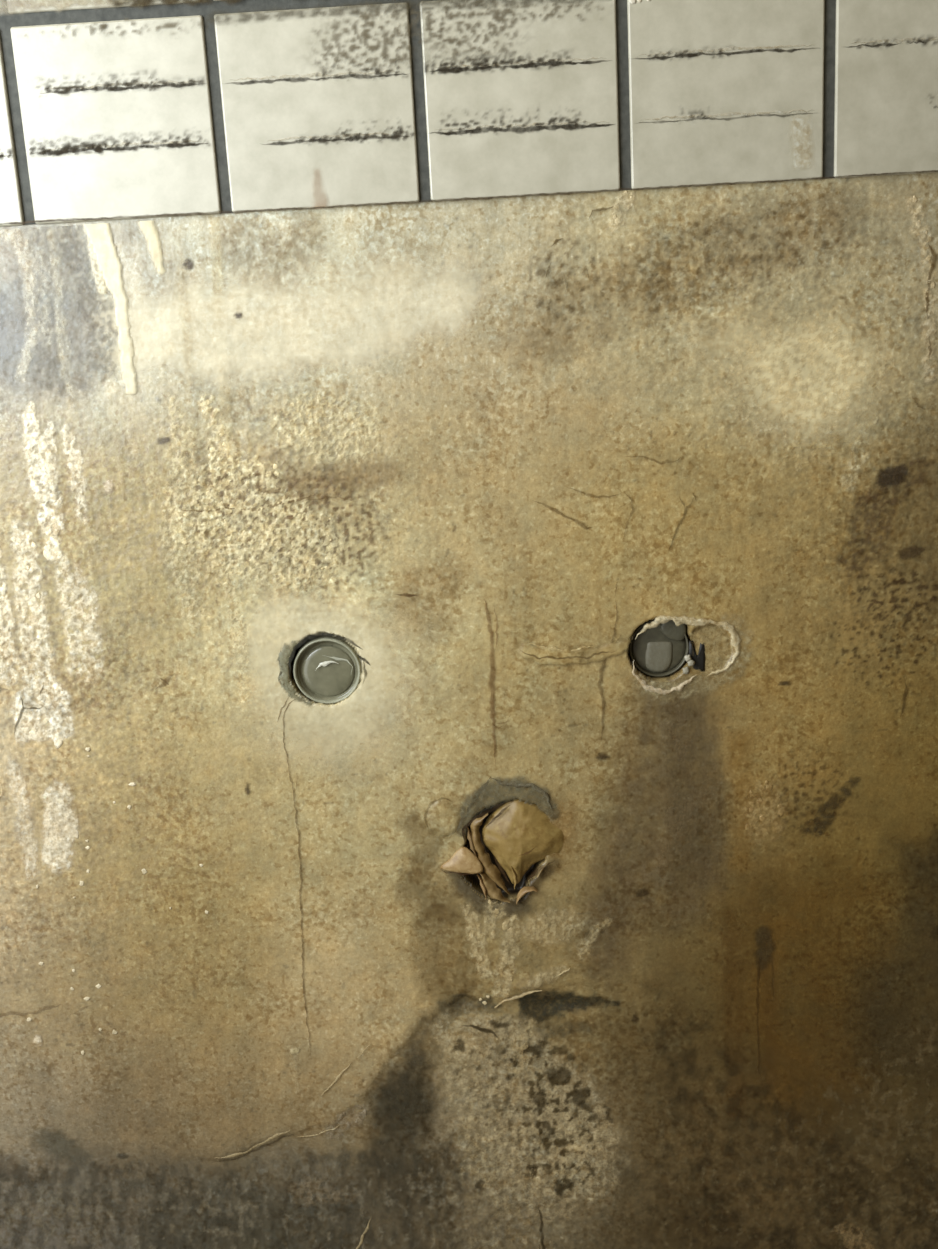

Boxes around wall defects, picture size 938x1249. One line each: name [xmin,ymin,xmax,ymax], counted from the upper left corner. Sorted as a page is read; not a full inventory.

damp [0,226,108,392]
crack [926,242,937,350]
damp [836,459,938,683]
crack [485,601,496,765]
flaking render [632,616,750,695]
crack [278,702,310,1045]
spalling [457,776,573,865]
damp [586,684,720,966]
crack [0,1004,61,1017]
crack [216,1126,338,1158]
damp [374,1008,449,1170]
crack [538,1210,546,1249]